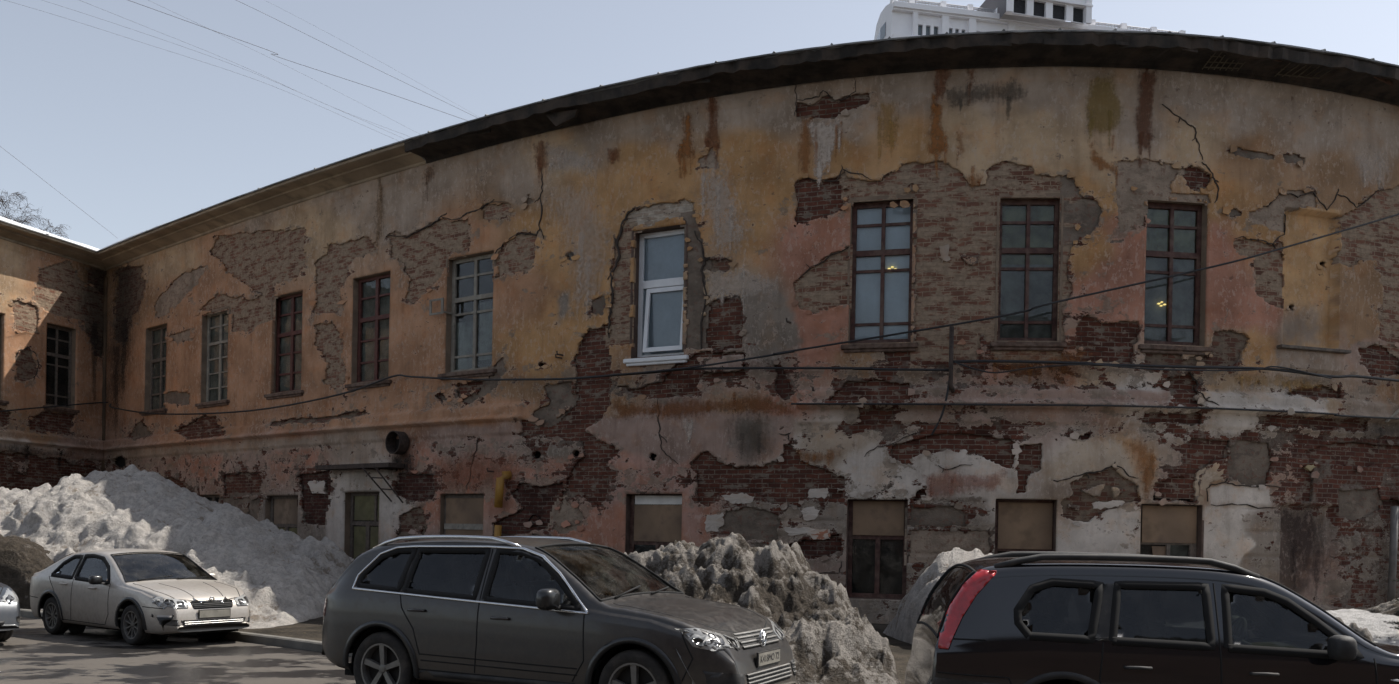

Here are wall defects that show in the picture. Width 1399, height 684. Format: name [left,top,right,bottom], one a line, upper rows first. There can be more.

rust [676,97,720,178]
spalling [796,93,870,119]
crack [1162,104,1219,203]
spalling [9,227,376,389]
spalling [791,155,1316,367]
spalling [1316,186,1399,376]
spalling [0,452,130,491]
spalling [125,389,226,441]
spalling [491,199,748,536]
spalling [685,444,845,561]
flaking render [904,525,990,565]
spalling [890,433,1042,494]